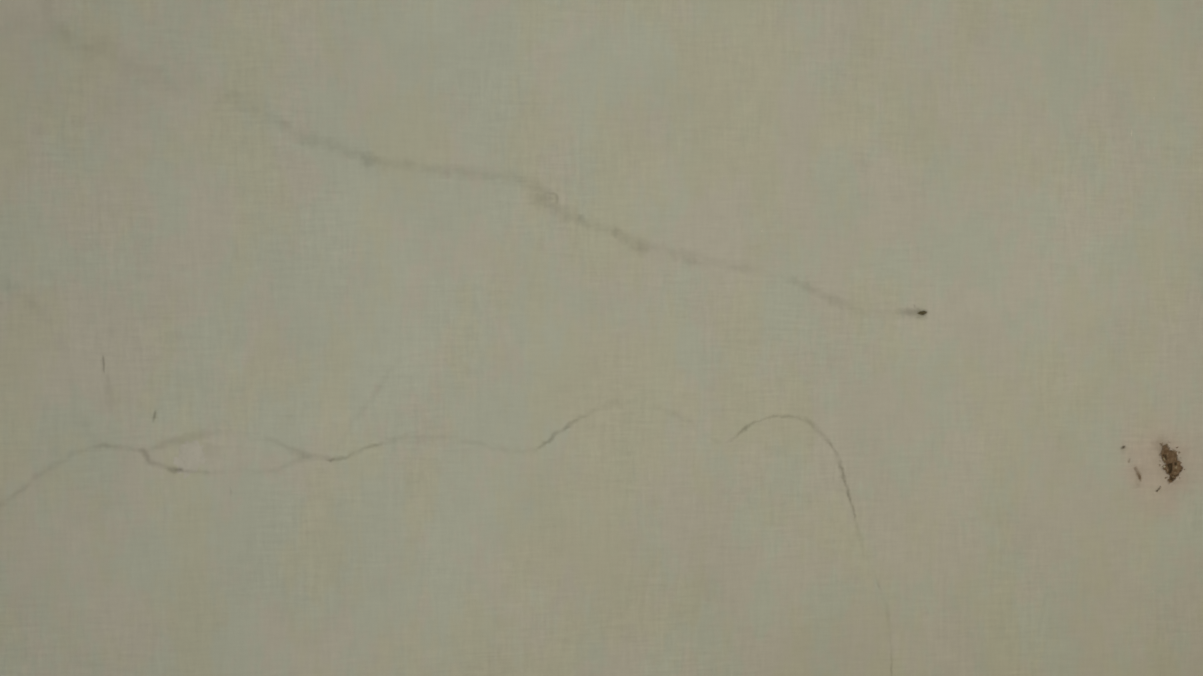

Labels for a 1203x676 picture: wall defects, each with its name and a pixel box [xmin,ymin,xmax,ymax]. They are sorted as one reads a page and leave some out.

spalling [1157,443,1185,491]